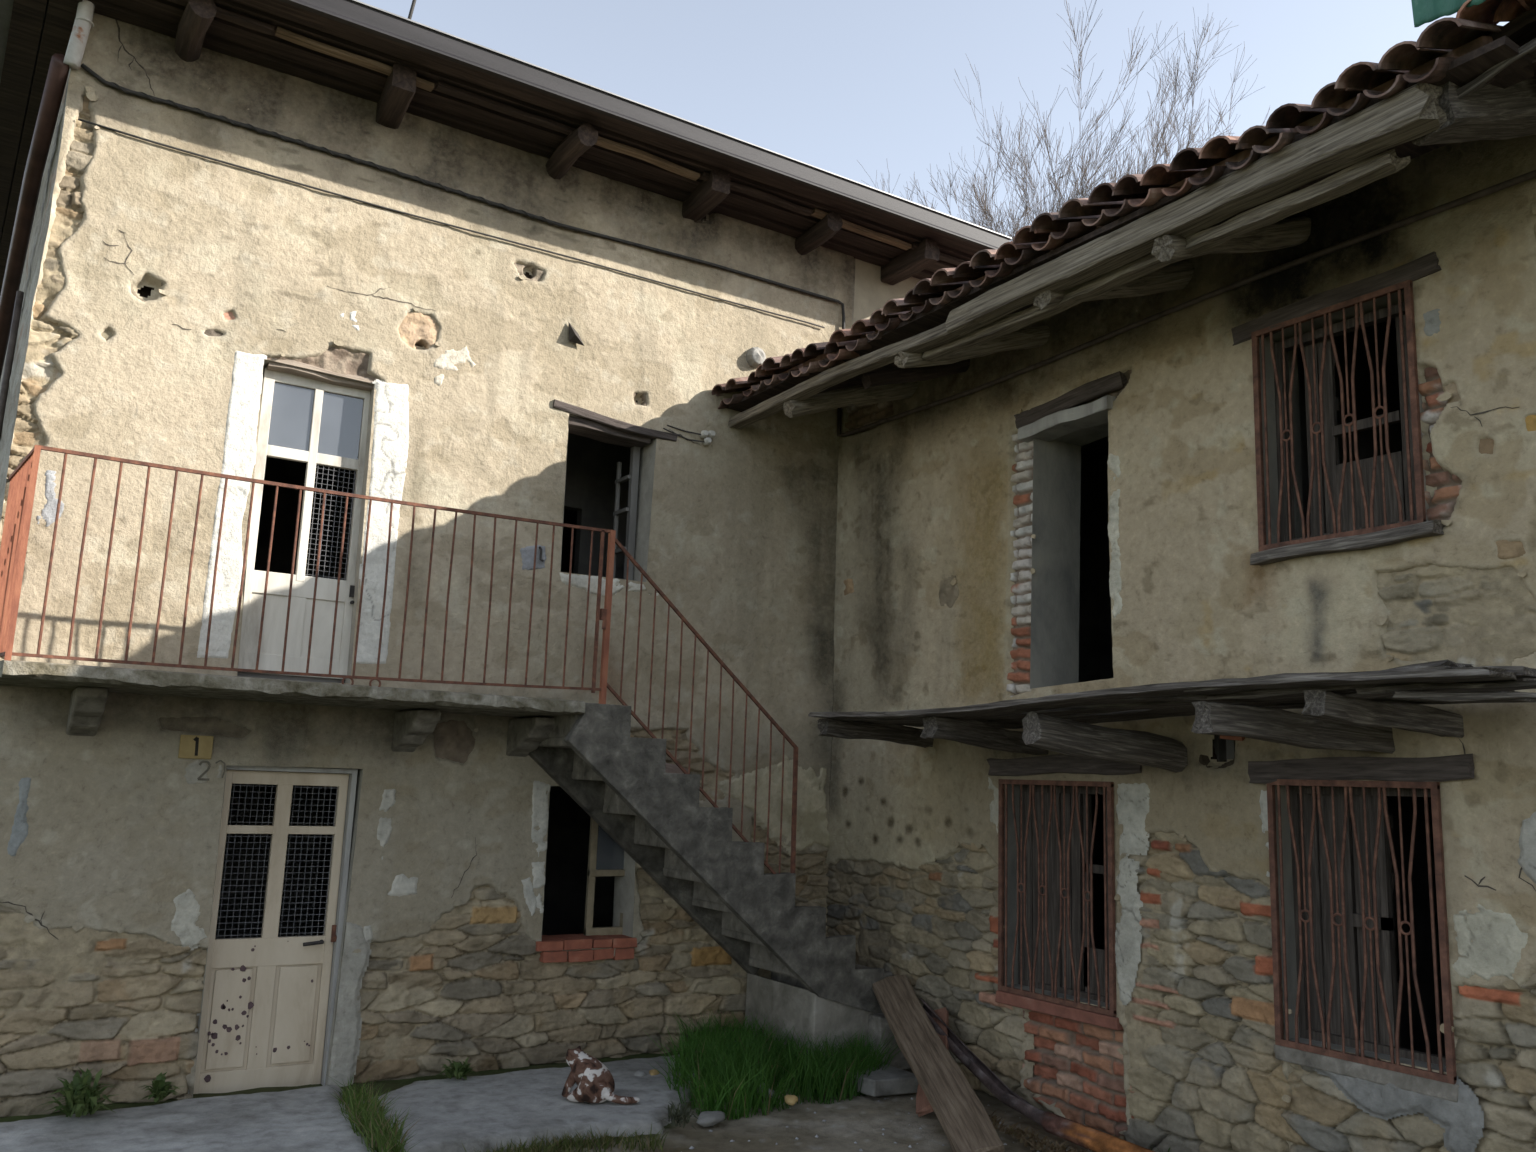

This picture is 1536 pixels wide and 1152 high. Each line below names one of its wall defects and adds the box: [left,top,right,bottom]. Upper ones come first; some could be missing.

flaking render [0,86,100,547]
spalling [131,282,170,302]
spalling [204,312,235,336]
spalling [398,307,441,349]
flaking render [1419,367,1462,526]
flaking render [1373,540,1536,667]
flaking render [0,889,310,1117]
flaking render [353,780,771,1083]
flaking render [826,777,1451,1152]
flaking render [1440,904,1536,1152]